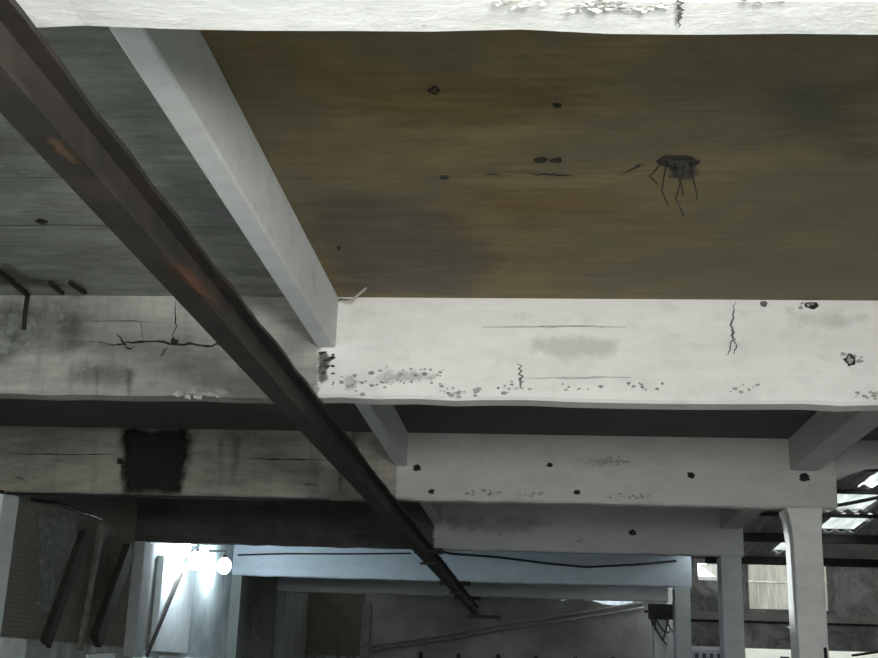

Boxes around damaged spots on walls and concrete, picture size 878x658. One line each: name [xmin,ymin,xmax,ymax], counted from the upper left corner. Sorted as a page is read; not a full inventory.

spalling [649,155,701,217]
spalling [0,267,87,361]
crack [68,301,220,357]
crack [726,301,737,355]